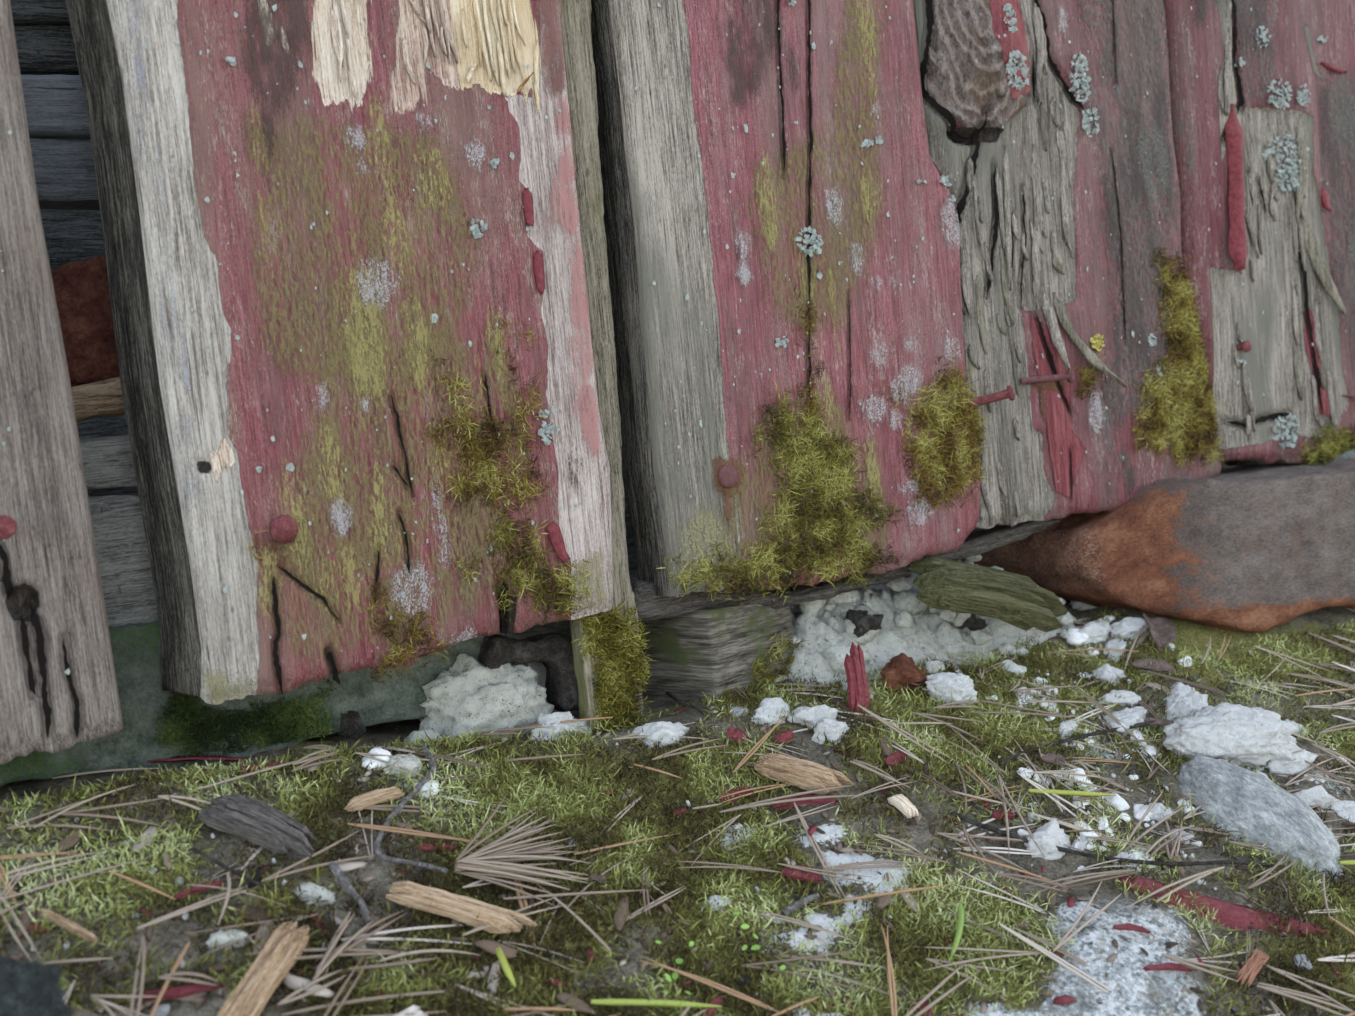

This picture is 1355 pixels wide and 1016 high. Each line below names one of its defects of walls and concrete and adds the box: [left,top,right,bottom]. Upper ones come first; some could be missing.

crack [0,544,80,738]
crack [272,566,340,694]
crack [374,395,413,604]
peeling [507,0,613,620]
crack [777,0,813,412]
crack [845,295,853,420]
peeling [912,0,1127,529]
peeling [1210,0,1355,450]